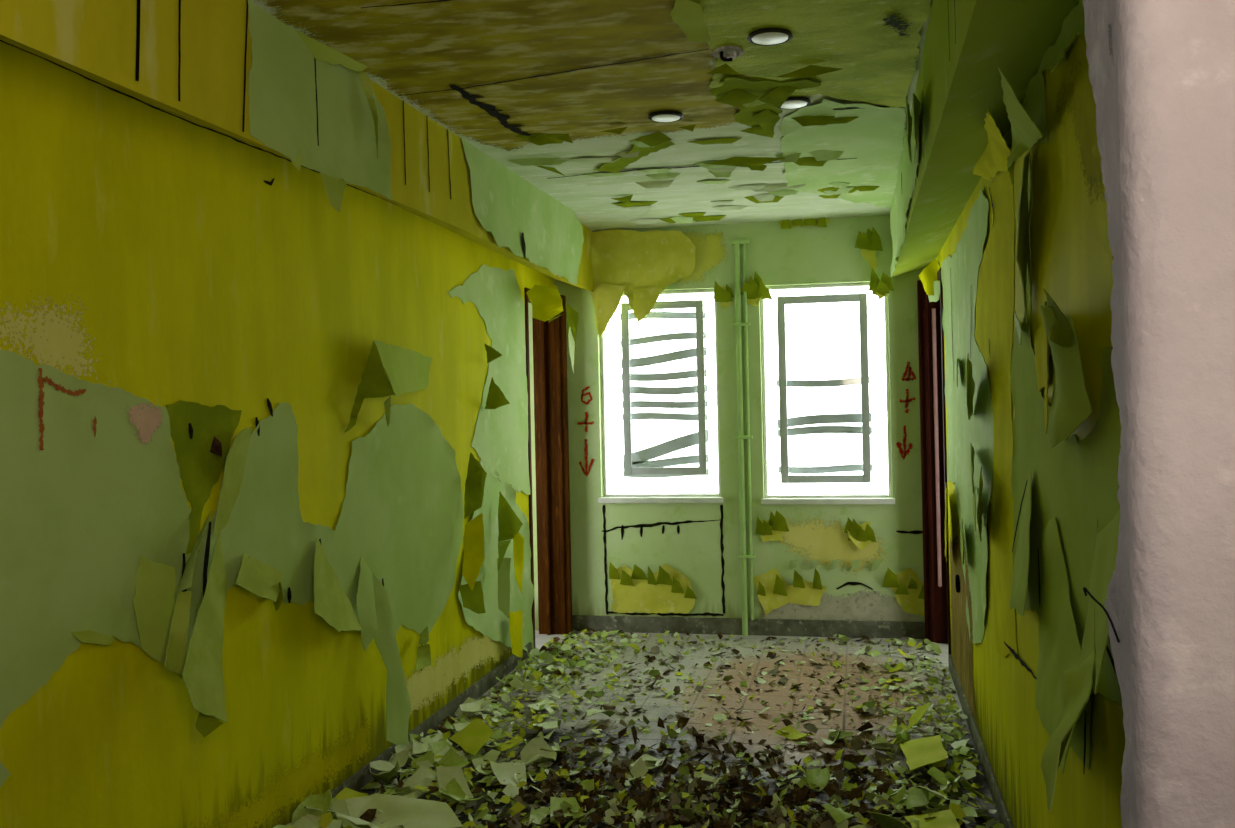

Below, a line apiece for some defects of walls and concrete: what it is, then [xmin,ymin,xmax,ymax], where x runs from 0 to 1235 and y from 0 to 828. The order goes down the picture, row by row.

peeling [0,0,931,746]
crack [346,49,708,208]
peeling [919,0,1122,814]